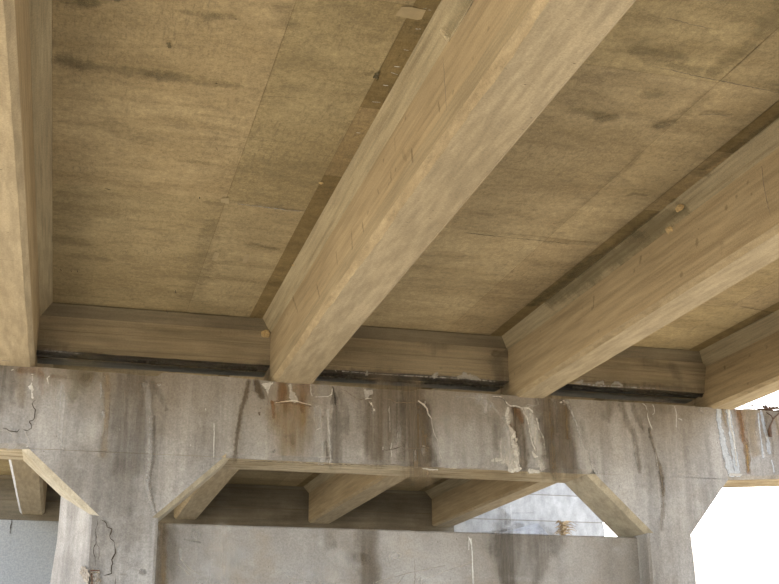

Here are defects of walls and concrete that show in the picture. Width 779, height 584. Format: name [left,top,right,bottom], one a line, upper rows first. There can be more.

crack [0,401,36,448]
water stain [36,353,257,462]
efflorescence [716,409,742,477]
spalling [79,566,101,584]
crack [93,520,122,583]